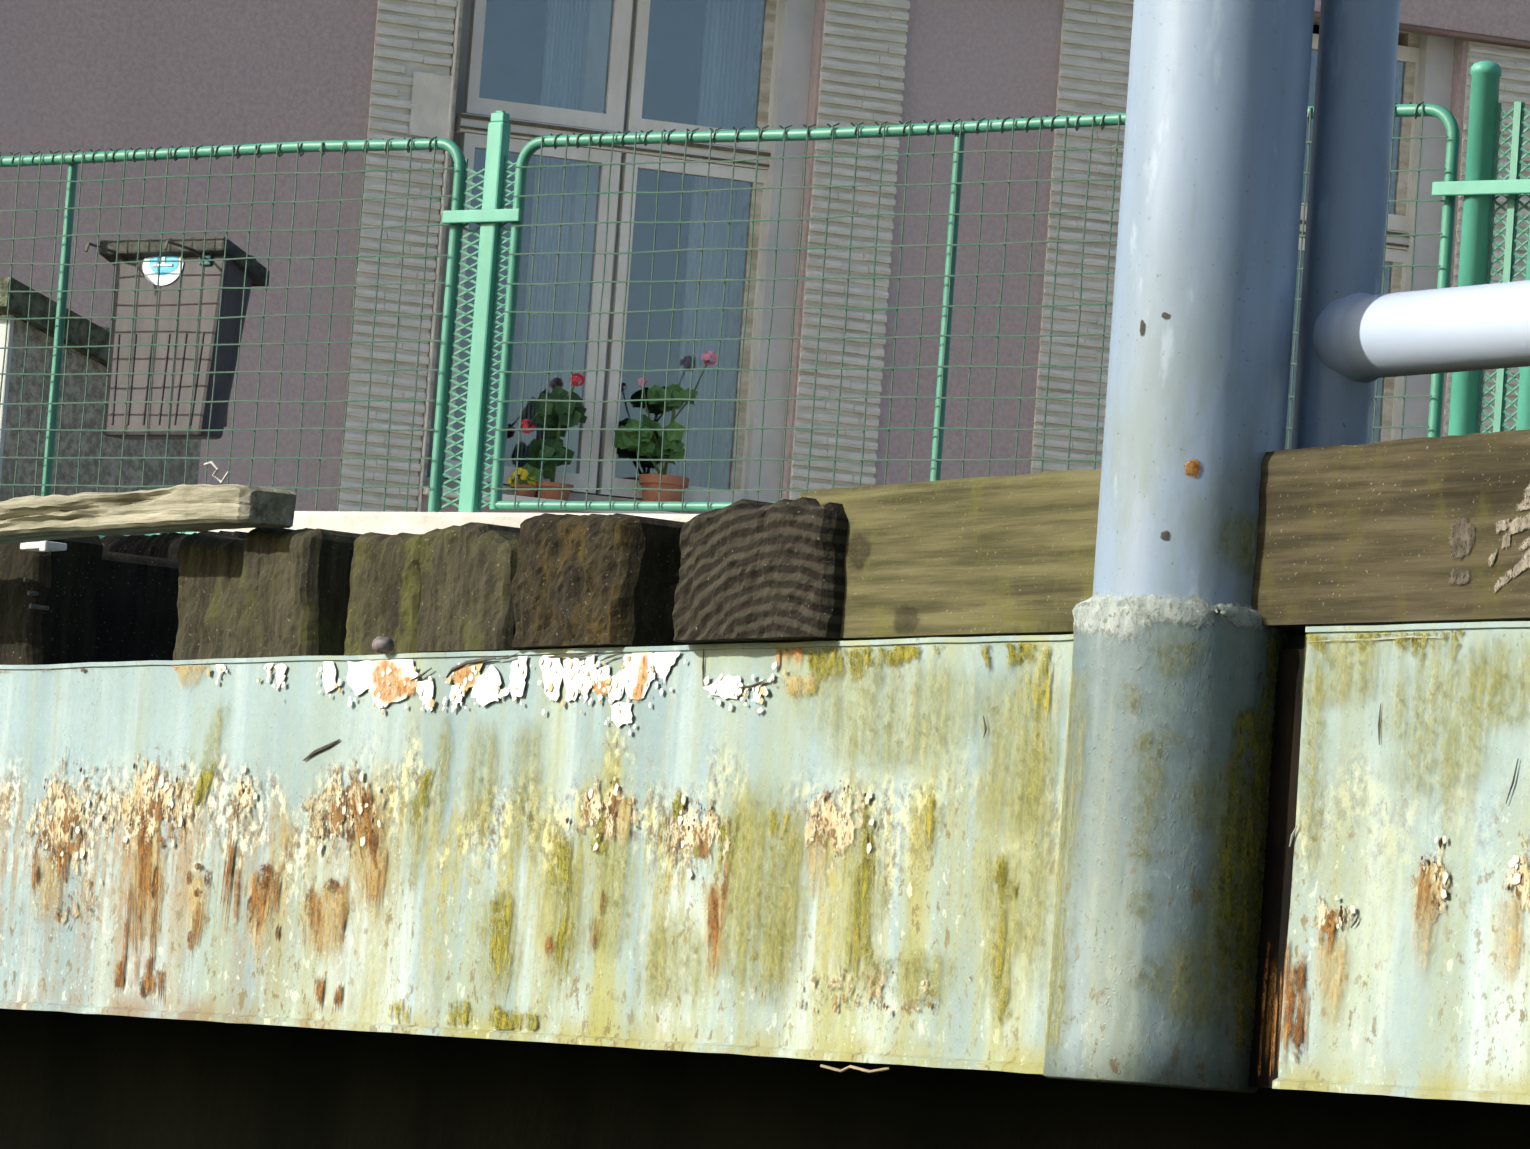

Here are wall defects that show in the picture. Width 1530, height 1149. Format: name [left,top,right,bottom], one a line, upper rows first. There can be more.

peeling [257,663,287,701]
peeling [316,652,686,735]
peeling [703,661,786,714]
damp [784,644,943,696]
corrosion [115,761,165,998]
corrosion [187,831,279,956]
corrosion [303,772,386,951]
damp [489,892,537,1030]
damp [665,792,684,835]
corrosion [705,863,728,974]
damp [846,827,873,972]
corrosion [1258,912,1344,1077]